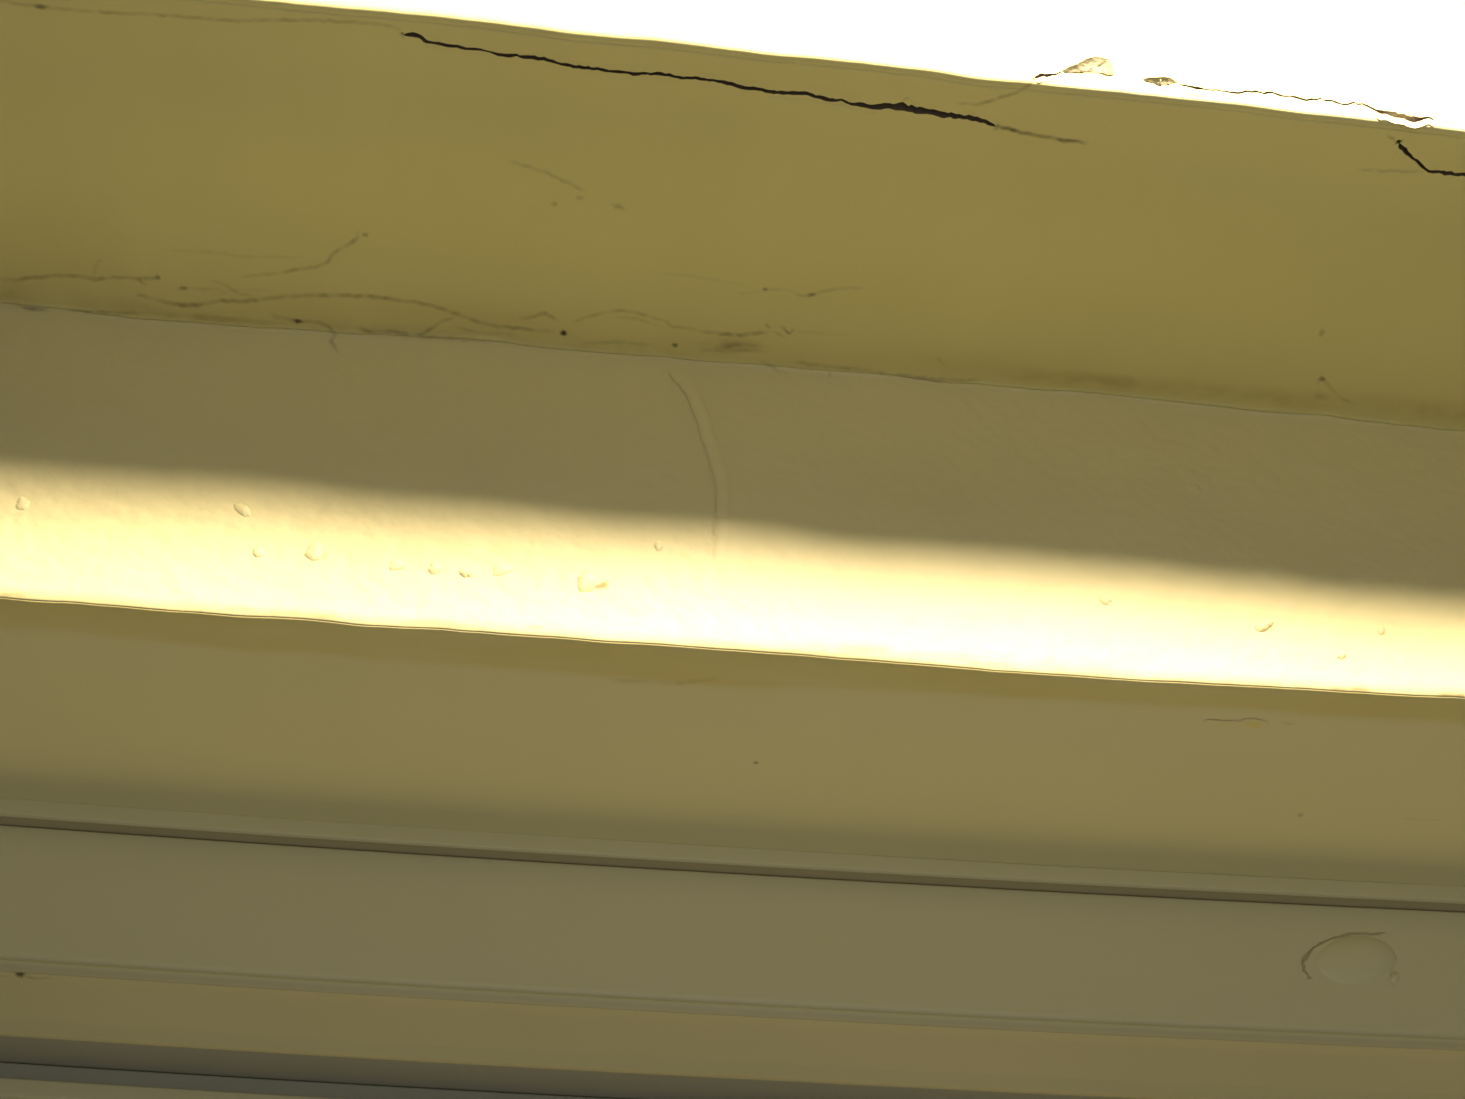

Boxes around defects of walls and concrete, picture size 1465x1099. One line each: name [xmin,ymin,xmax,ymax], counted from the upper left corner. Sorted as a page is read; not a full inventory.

crack [403,27,1015,131]
flaking render [1059,56,1114,76]
flaking render [1142,77,1177,86]
crack [1178,79,1465,181]